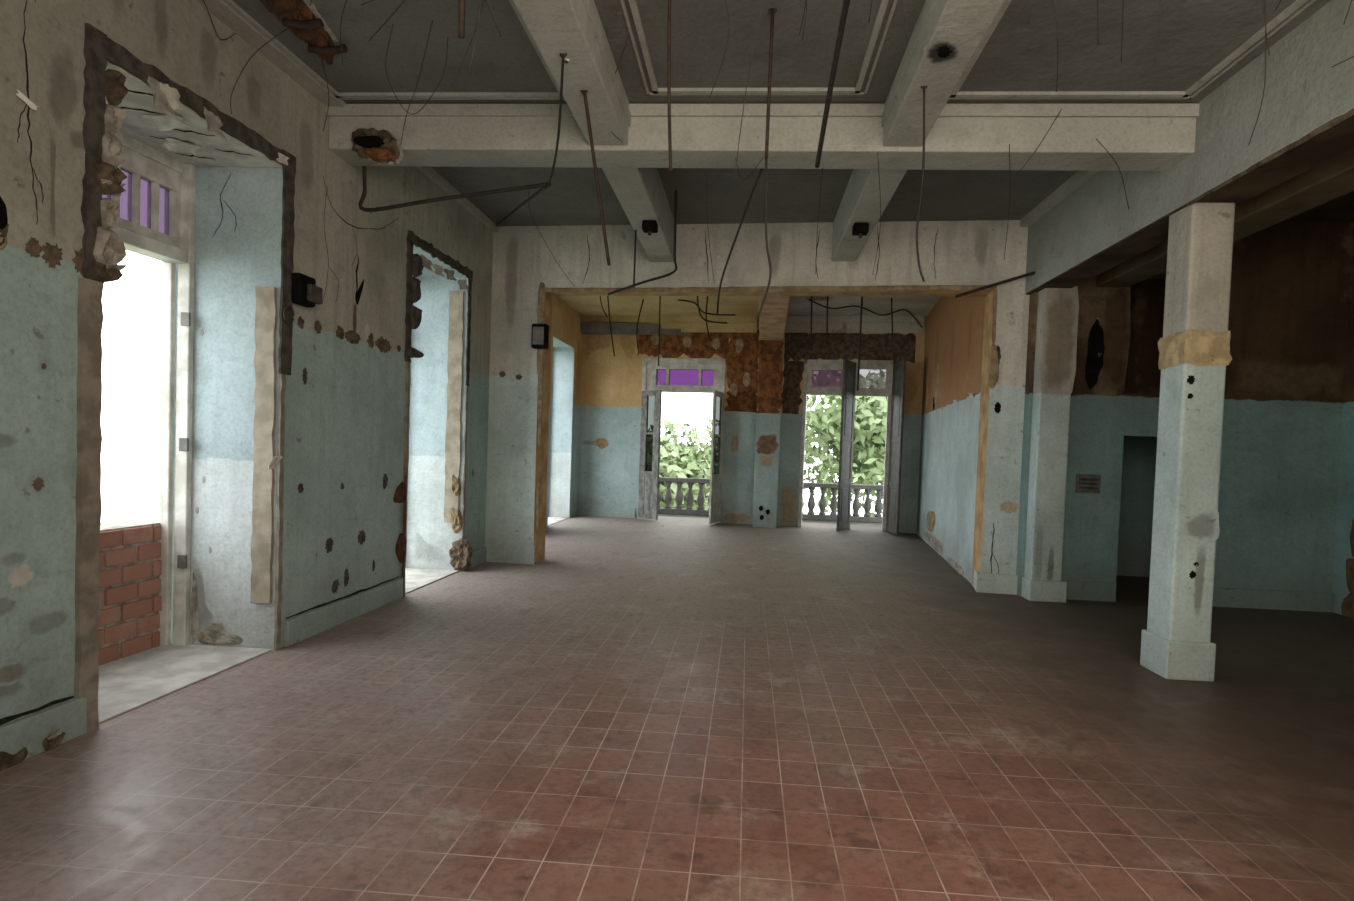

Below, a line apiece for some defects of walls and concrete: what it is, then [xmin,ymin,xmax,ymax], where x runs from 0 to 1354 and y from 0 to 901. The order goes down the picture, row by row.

spalling [260,0,348,65]
spalling [25,69,253,282]
spalling [351,128,404,166]
spalling [1186,108,1354,207]
spalling [0,196,9,250]
spalling [537,282,1016,428]
spalling [499,349,544,447]
spalling [759,481,798,527]
spalling [331,568,350,593]
spalling [0,728,66,772]